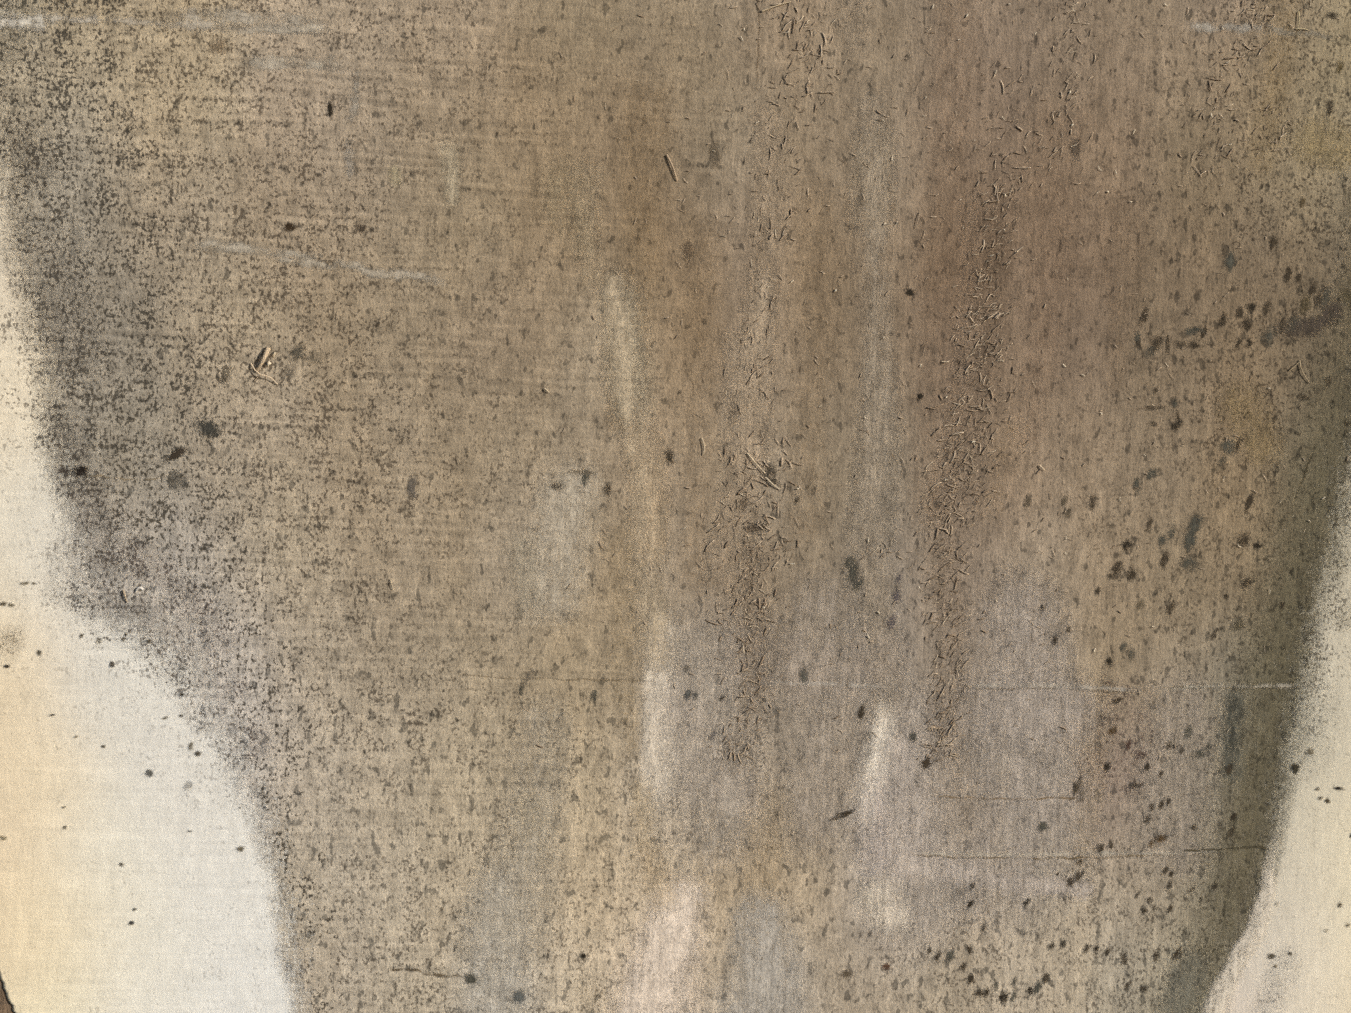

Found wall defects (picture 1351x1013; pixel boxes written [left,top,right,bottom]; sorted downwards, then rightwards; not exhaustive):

water stain [436,136,466,209]
water stain [267,251,448,286]
water stain [0,0,361,1013]
water stain [406,469,421,502]
water stain [443,0,1350,1013]